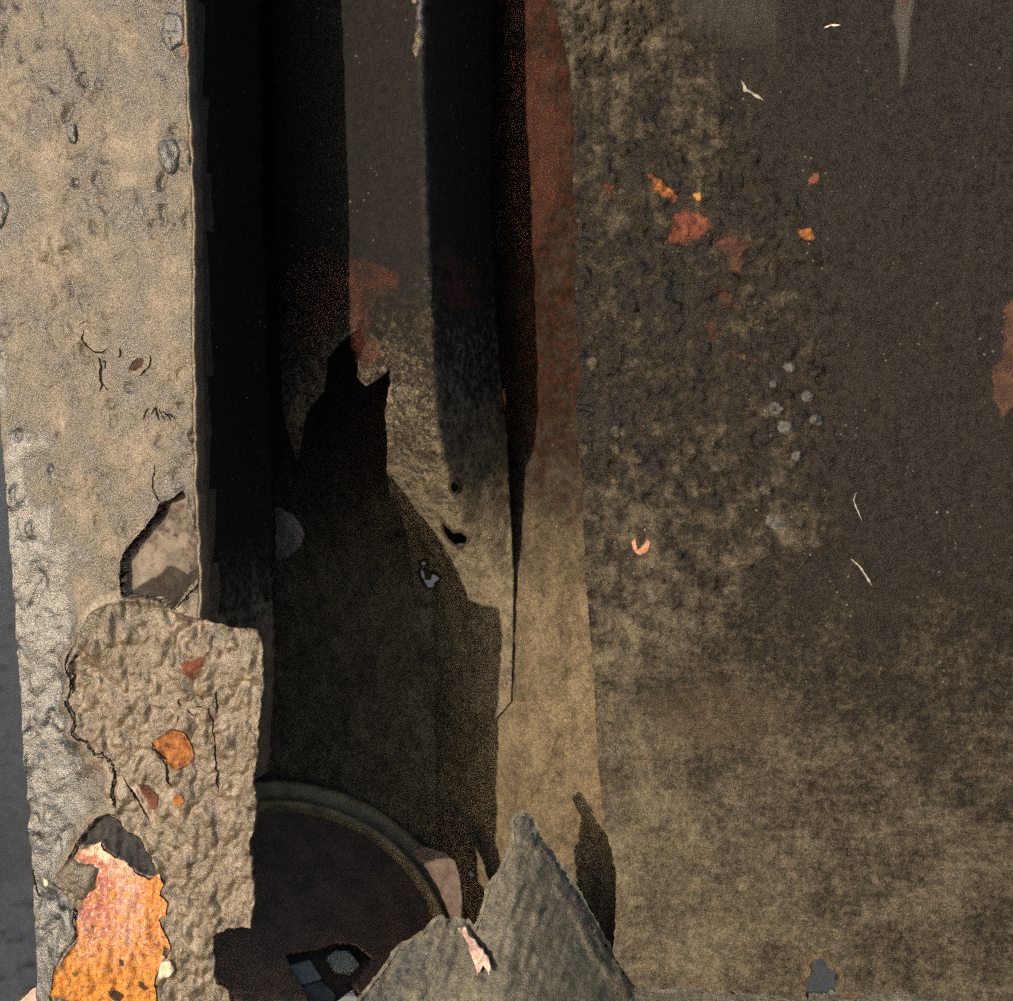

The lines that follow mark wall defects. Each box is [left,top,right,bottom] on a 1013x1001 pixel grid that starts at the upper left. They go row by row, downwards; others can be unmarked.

corrosion [648,174,710,243]
corrosion [717,236,748,273]
corrosion [799,228,815,240]
crack [77,313,121,391]
corrosion [991,300,1013,418]
crack [143,407,176,421]
spalling [72,468,212,658]
crack [32,628,118,931]
peeling [123,777,158,828]
spalling [81,815,157,875]
corrosion [50,842,174,1001]